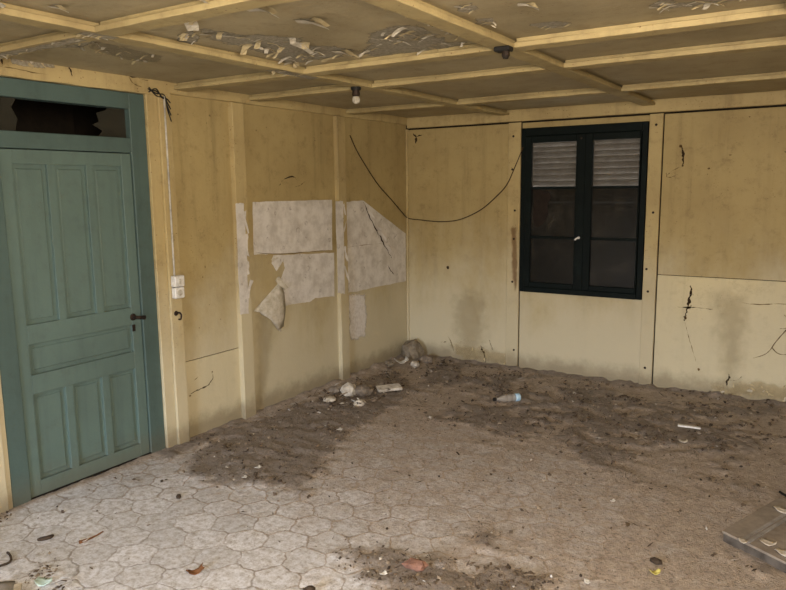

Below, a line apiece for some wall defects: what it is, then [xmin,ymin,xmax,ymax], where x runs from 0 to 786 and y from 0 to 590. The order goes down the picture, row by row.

peeling [295,17,330,30]
peeling [177,20,466,79]
crack [683,285,711,360]